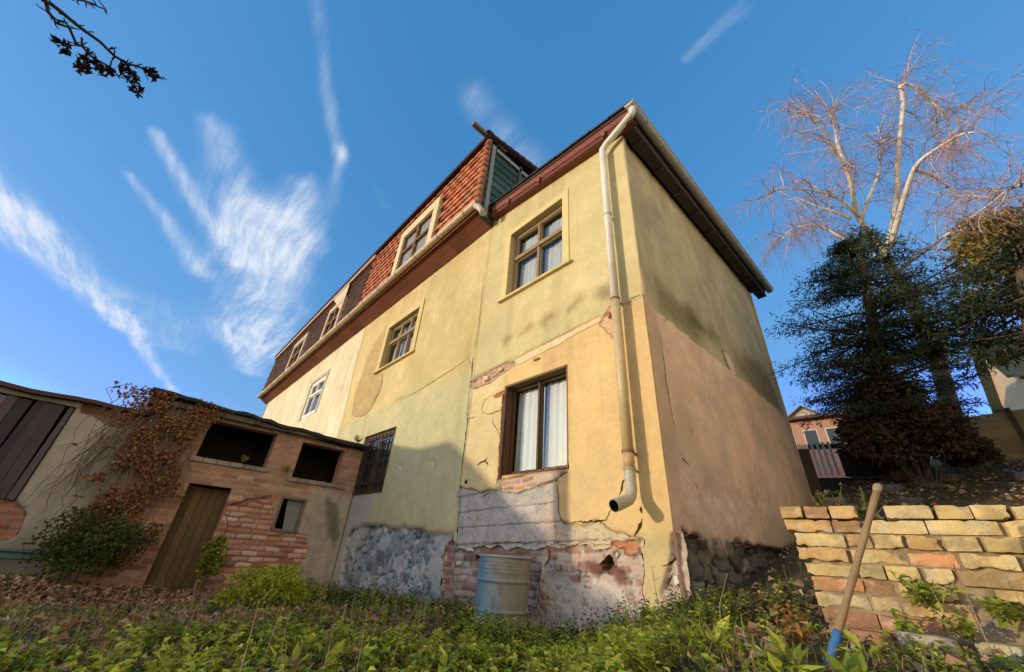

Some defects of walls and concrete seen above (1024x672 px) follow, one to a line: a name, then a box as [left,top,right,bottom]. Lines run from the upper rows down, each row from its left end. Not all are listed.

crack [372,288,502,585]
flaking render [339,306,644,632]
flaking render [0,501,26,541]
flaking render [223,496,308,590]
flaking render [660,529,790,607]